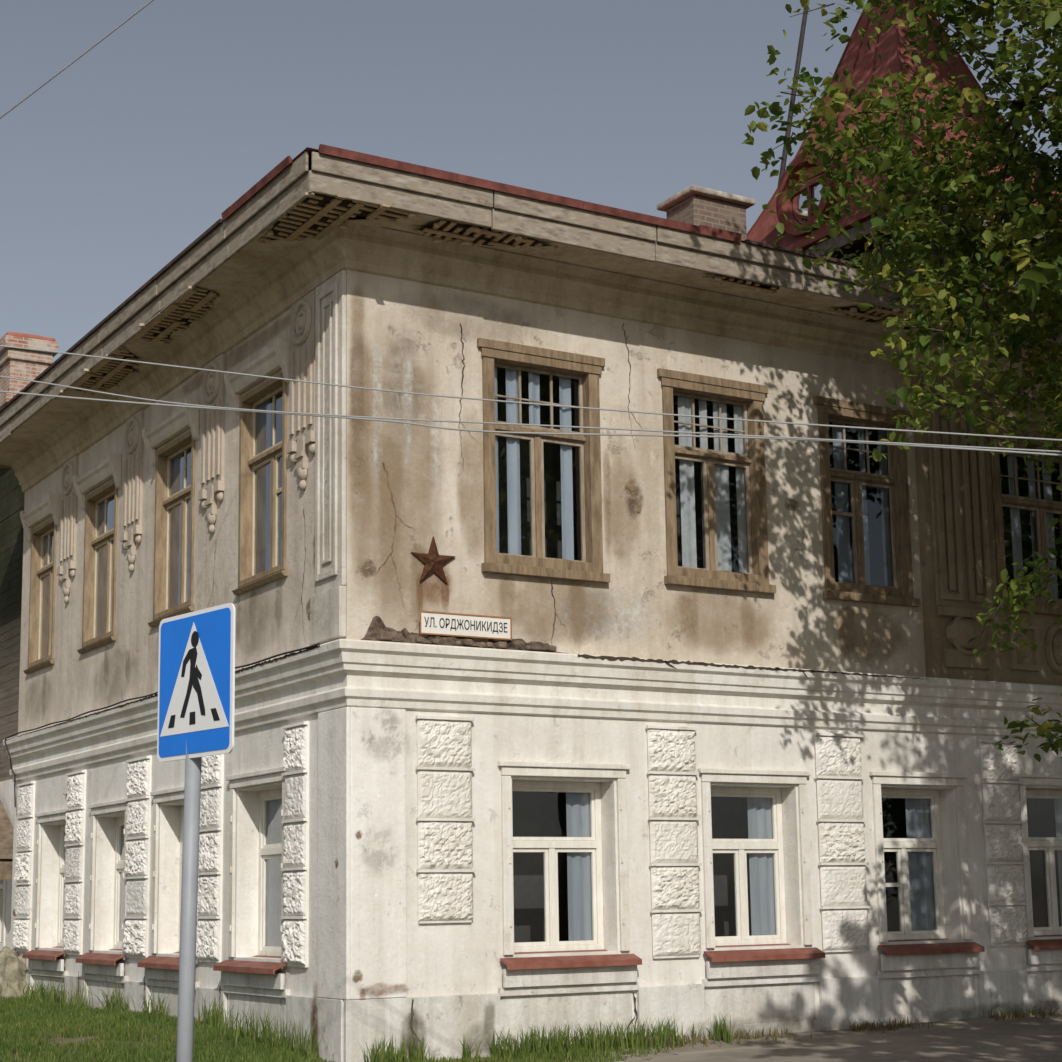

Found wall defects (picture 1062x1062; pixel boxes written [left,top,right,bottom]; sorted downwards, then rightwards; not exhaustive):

crack [375,462,418,608]
crack [235,549,320,673]
peeling [374,631,392,641]
peeling [455,639,507,649]
peeling [523,641,557,652]
crack [18,694,158,737]